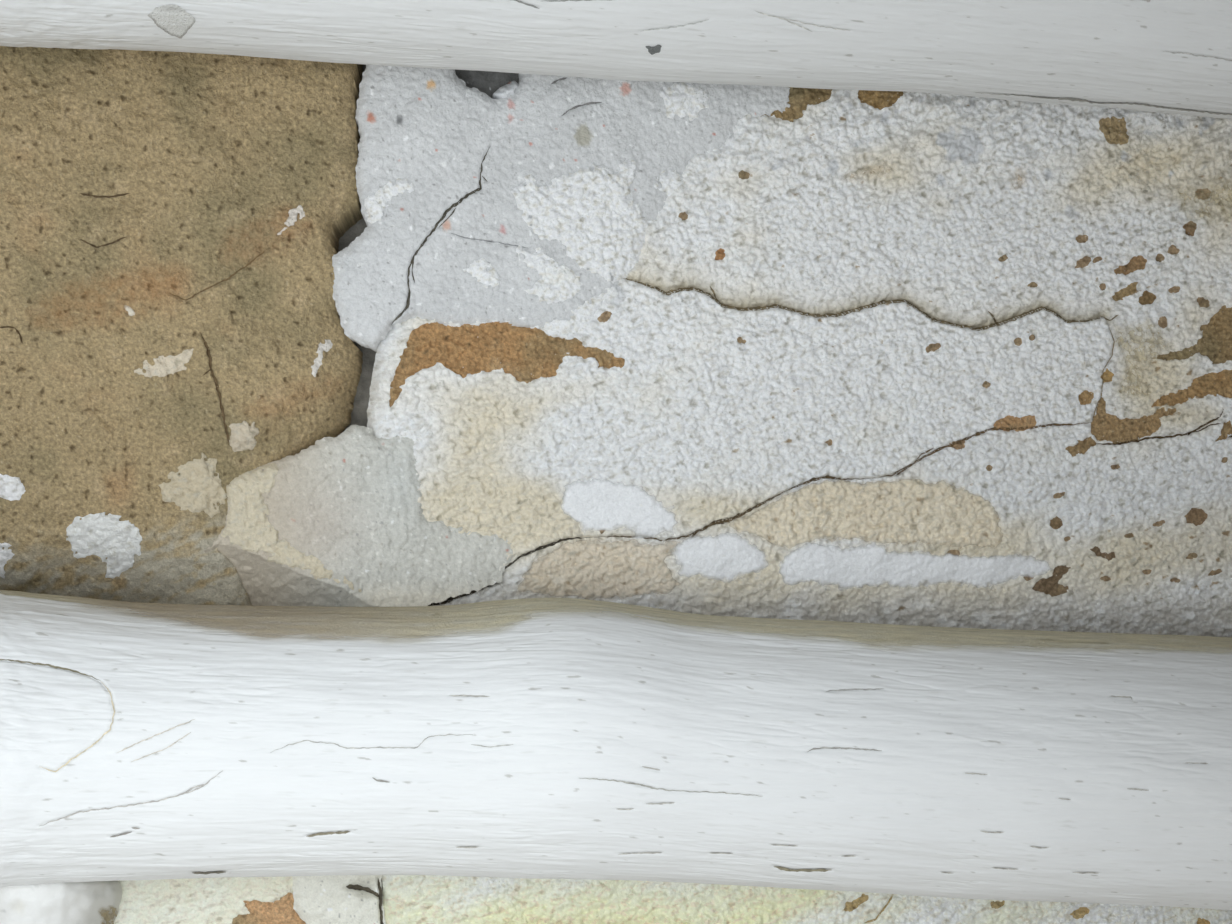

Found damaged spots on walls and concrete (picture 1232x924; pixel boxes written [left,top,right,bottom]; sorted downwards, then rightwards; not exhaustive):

peeling [762,87,832,122]
peeling [858,90,903,110]
crack [391,147,526,325]
peeling [389,321,625,407]
peeling [1065,297,1232,457]
crack [428,278,1232,606]
peeling [1023,565,1071,597]
crack [0,659,195,772]
peeling [232,892,306,924]
crack [346,879,384,924]